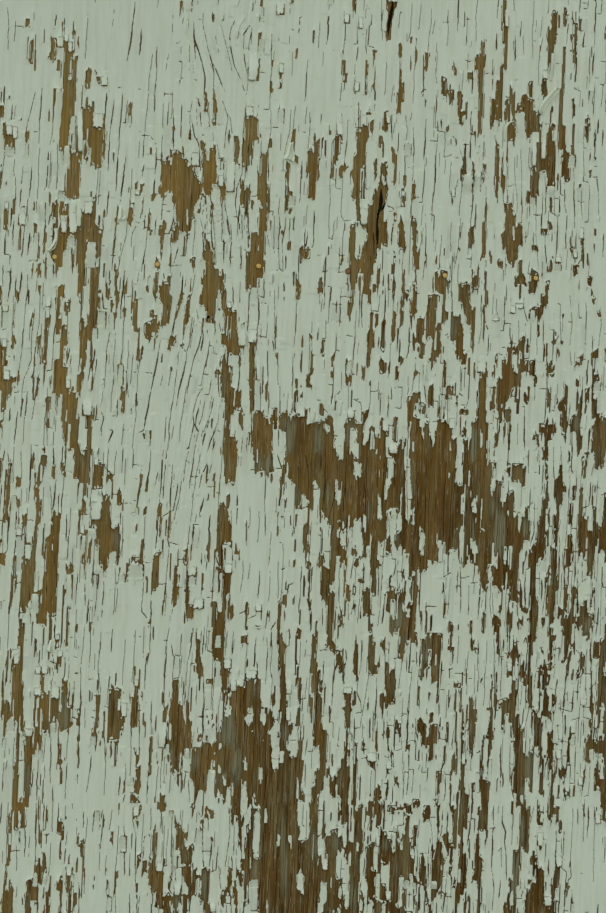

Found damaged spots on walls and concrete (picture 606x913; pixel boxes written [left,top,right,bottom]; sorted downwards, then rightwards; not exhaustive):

peeling [270,61,284,93]
peeling [344,0,363,29]
peeling [341,50,377,95]
peeling [382,0,397,42]
peeling [398,37,430,107]
peeling [441,0,582,314]
crack [483,0,606,283]
peeling [0,22,273,913]
crack [0,0,481,913]
peeling [89,69,606,913]
crack [233,271,606,913]